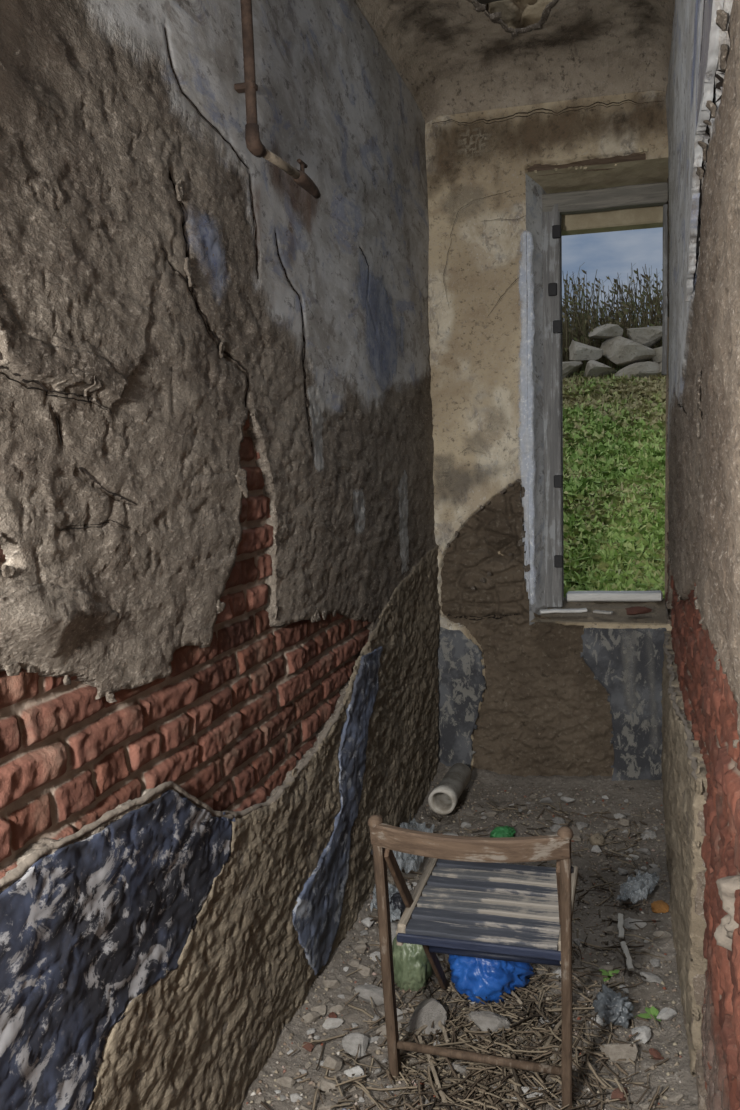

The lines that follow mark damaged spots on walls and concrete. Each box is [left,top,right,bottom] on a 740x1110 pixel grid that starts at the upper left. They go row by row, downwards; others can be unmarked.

spalling [467,0,558,37]
flaking render [685,0,724,302]
crack [694,0,730,290]
peeling [199,220,225,288]
crack [162,27,313,447]
crack [51,407,62,445]
crack [677,370,703,438]
crack [61,467,137,531]
spalling [0,231,740,1110]